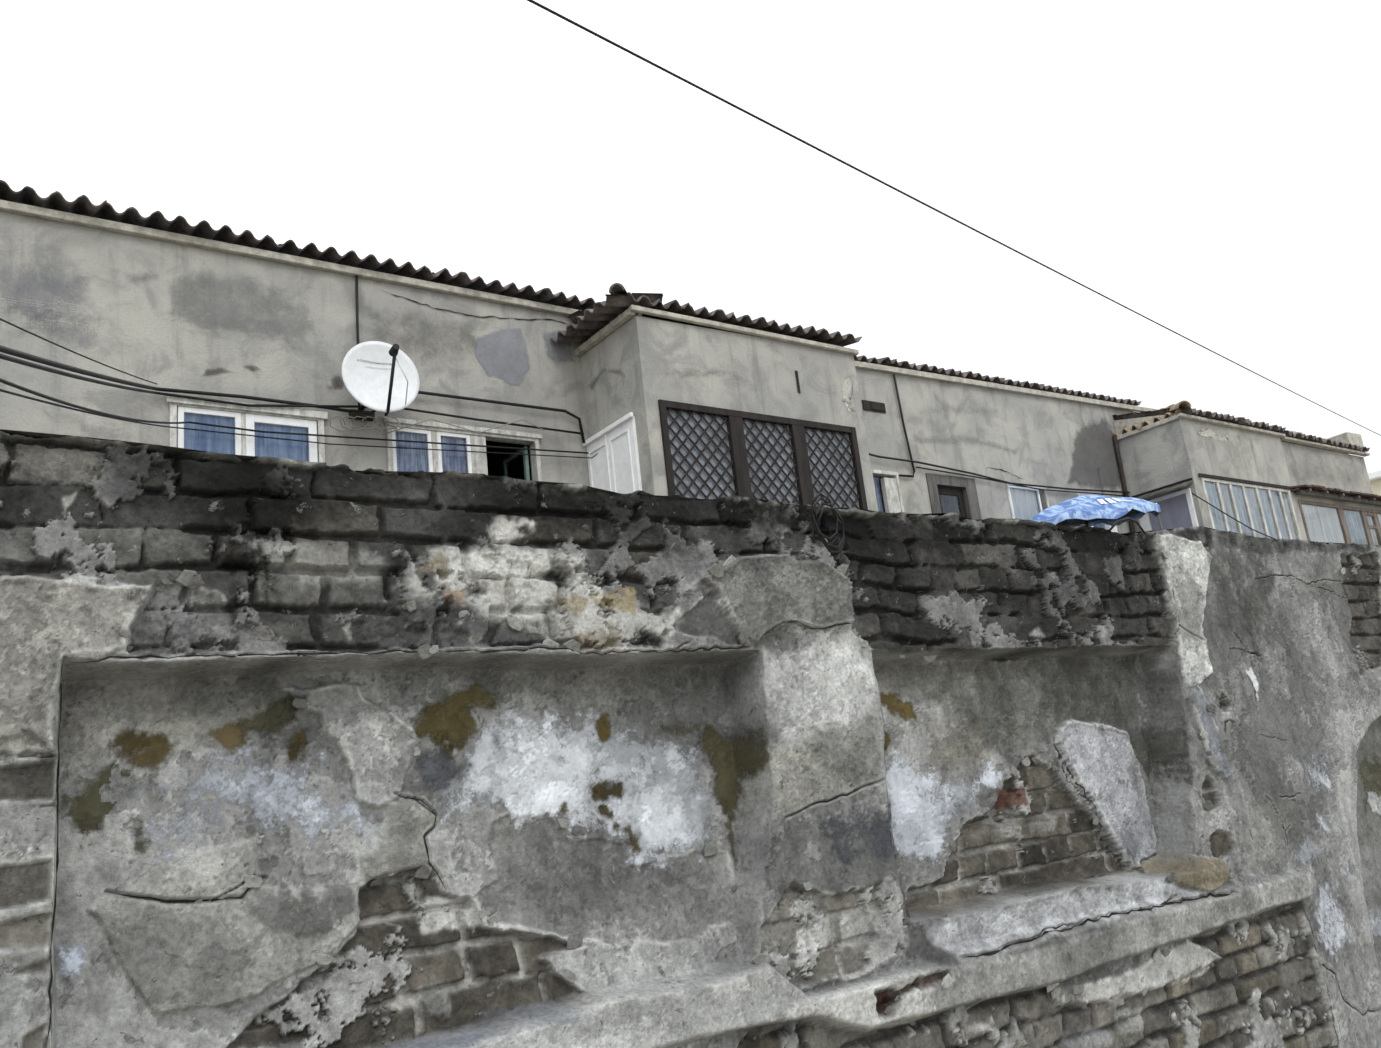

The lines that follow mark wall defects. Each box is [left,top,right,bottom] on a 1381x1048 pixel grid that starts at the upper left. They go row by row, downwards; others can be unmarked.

spalling [0,432,1236,811]
spalling [1340,553,1381,675]
spalling [0,860,52,974]
spalling [22,1025,50,1048]
water stain [133,736,371,857]
crack [28,621,850,1045]
spalling [226,719,1157,1048]
crack [787,783,874,817]
crack [1054,740,1133,870]
crack [962,891,1234,958]
spalling [1209,830,1236,862]
crack [1302,905,1377,1048]